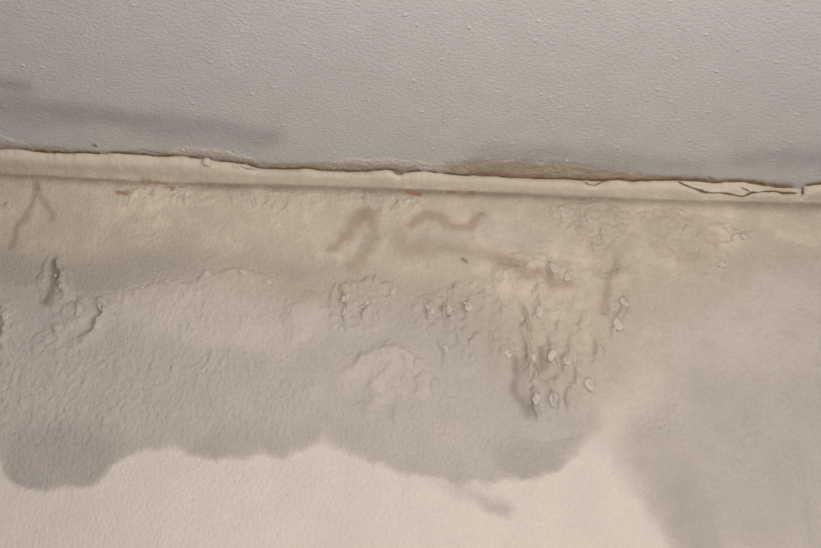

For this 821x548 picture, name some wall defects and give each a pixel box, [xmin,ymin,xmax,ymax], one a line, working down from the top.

damp [0,162,821,299]
crack [26,149,821,197]
damp [0,283,571,488]